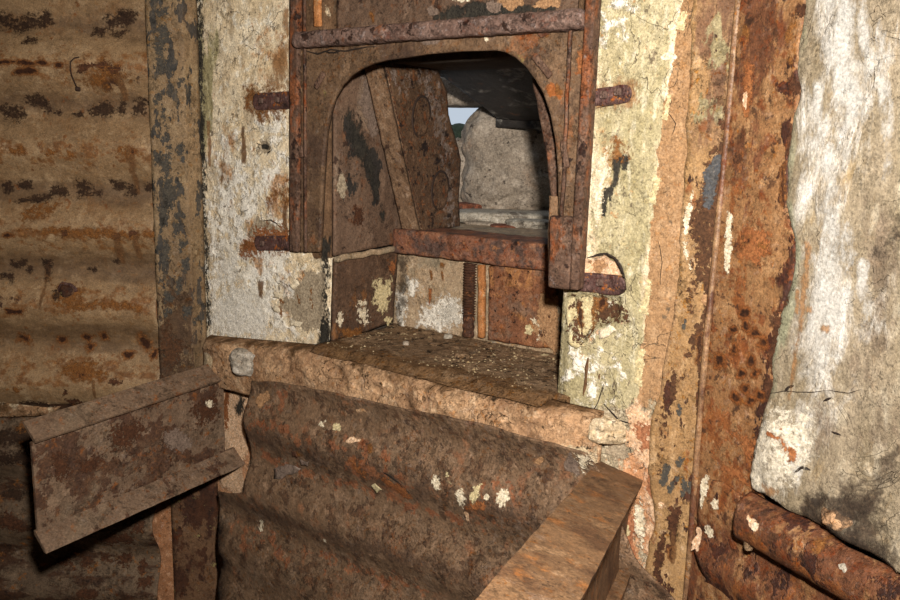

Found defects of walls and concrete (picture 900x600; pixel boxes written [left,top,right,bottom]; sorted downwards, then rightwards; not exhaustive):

corrosion [0,56,149,124]
corrosion [243,9,289,124]
peeling [661,94,672,121]
peeling [676,11,688,31]
corrosion [742,59,755,119]
corrosion [785,3,806,96]
peeling [152,0,213,378]
corrosion [779,123,793,227]
corrosion [0,257,142,313]
peeling [605,105,726,556]
corrosion [713,212,812,407]
crack [775,385,858,393]